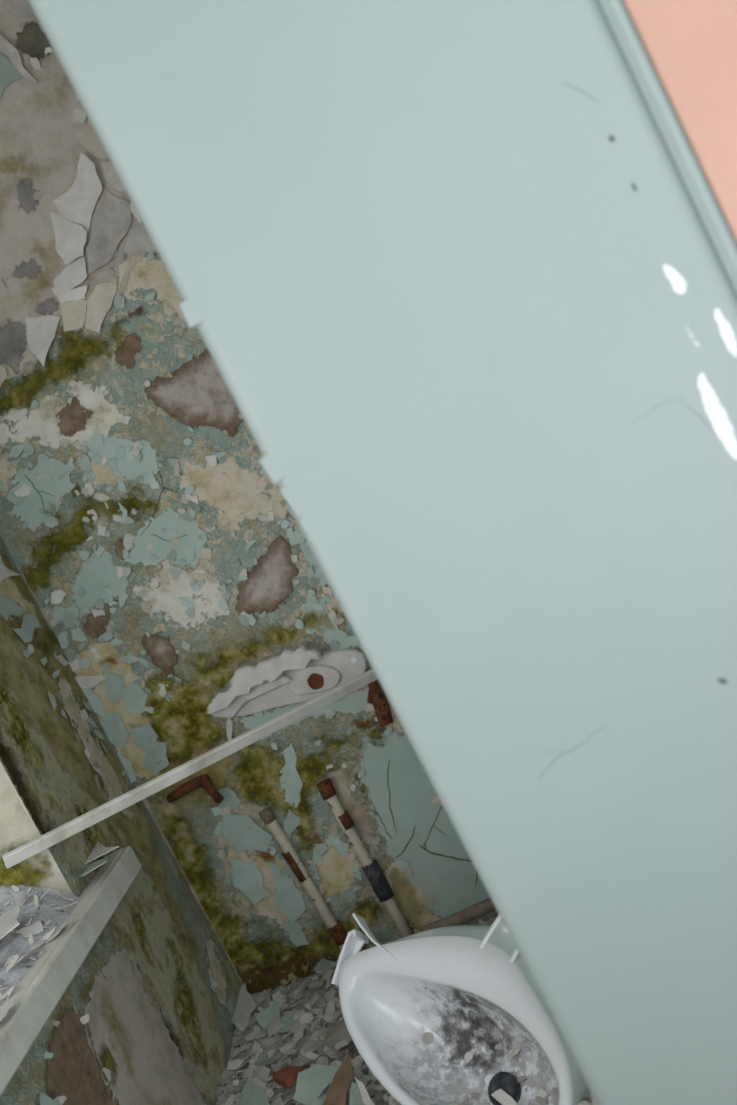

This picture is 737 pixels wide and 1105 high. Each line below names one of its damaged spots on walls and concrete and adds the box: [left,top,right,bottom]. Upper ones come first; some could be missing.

peeling [0,0,186,387]
flaking render [144,349,244,445]
peeling [697,372,737,461]
peeling [0,379,363,801]
leakage [0,551,131,805]
leakage [0,729,48,826]
leakage [110,756,233,944]
leakage [148,742,215,781]
peeling [208,687,490,946]
crack [370,760,478,886]
flaking render [40,946,207,1105]
leakage [236,952,337,994]